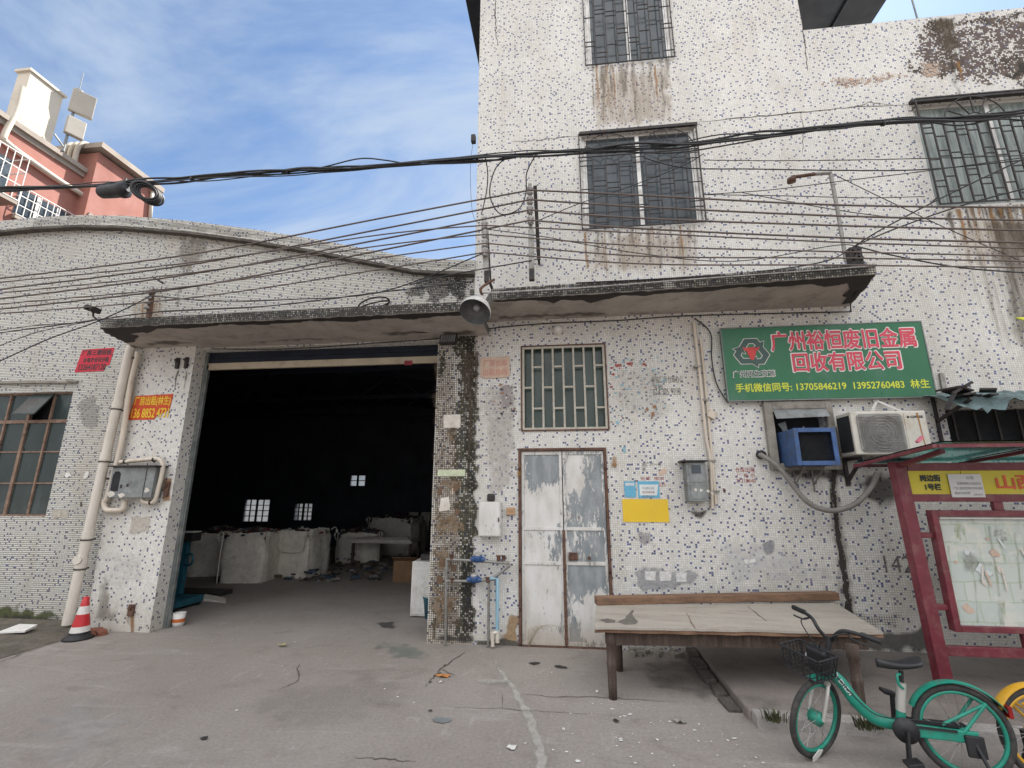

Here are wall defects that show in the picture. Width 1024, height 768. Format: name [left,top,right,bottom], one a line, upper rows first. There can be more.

damp [904,17,1024,87]
corrosion [947,204,1024,258]
damp [438,331,519,646]
damp [790,469,853,613]